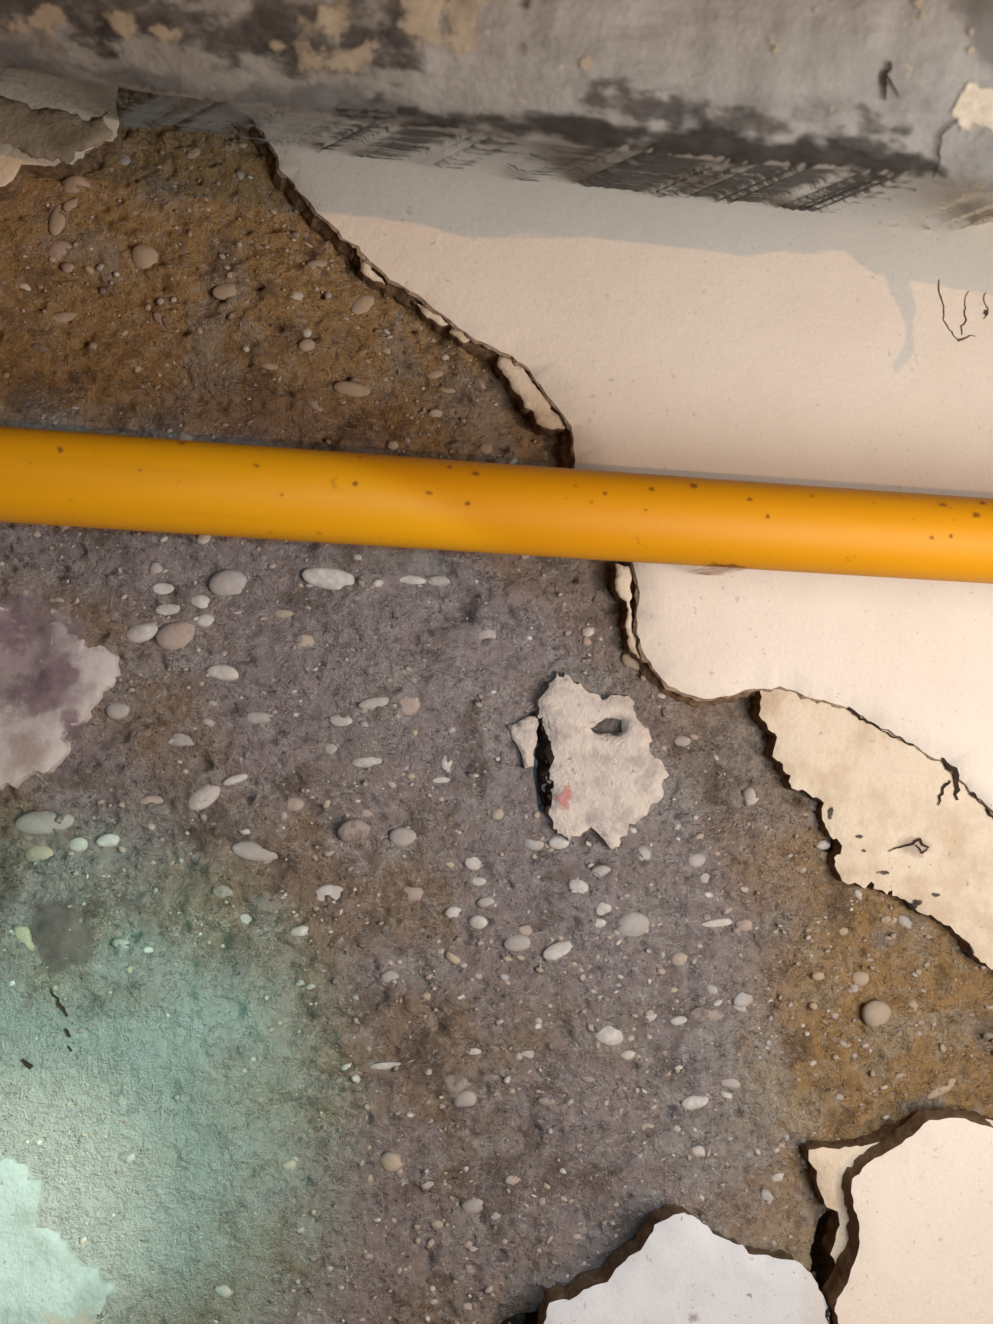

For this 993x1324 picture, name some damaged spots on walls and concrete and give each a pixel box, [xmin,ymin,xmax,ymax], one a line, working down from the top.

peeling [6,3,67,37]
peeling [104,10,182,45]
peeling [270,0,378,83]
peeling [397,0,498,55]
water stain [0,0,945,212]
spalling [882,61,899,100]
peeling [950,82,993,132]
spalling [0,67,565,467]
water stain [0,595,79,733]
crack [848,707,993,818]
water stain [32,901,93,973]
spalling [0,522,993,1324]